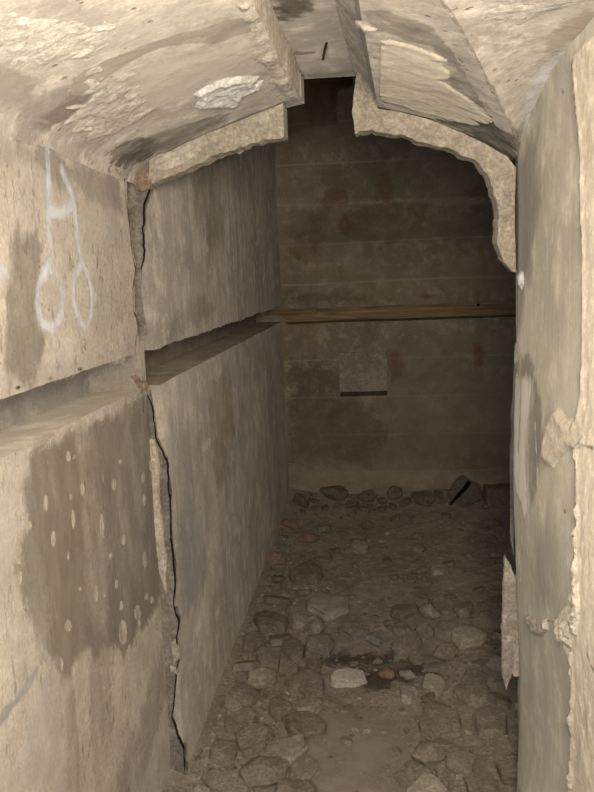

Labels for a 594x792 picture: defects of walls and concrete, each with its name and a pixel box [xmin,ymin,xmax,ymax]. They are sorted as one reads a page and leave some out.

spalling [194,0,296,110]
crack [124,170,154,287]
damp [21,397,159,674]
crack [131,375,185,773]
flaking render [501,36,594,792]